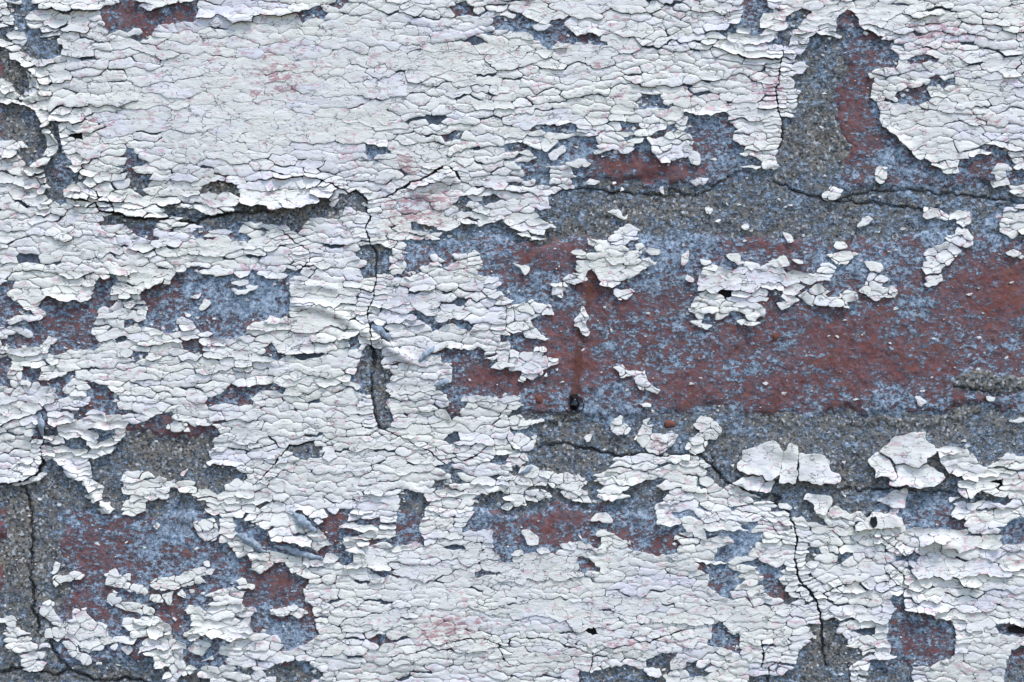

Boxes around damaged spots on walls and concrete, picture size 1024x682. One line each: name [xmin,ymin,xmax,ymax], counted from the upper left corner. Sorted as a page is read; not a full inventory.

crack [0,438,144,682]
peeling [0,0,371,247]
peeling [0,258,469,682]
crack [258,168,484,481]
corrosion [571,329,590,402]
crack [558,170,743,198]
peeling [340,0,1024,608]
crack [538,442,842,663]
peeling [752,589,964,682]
crack [773,181,1024,210]